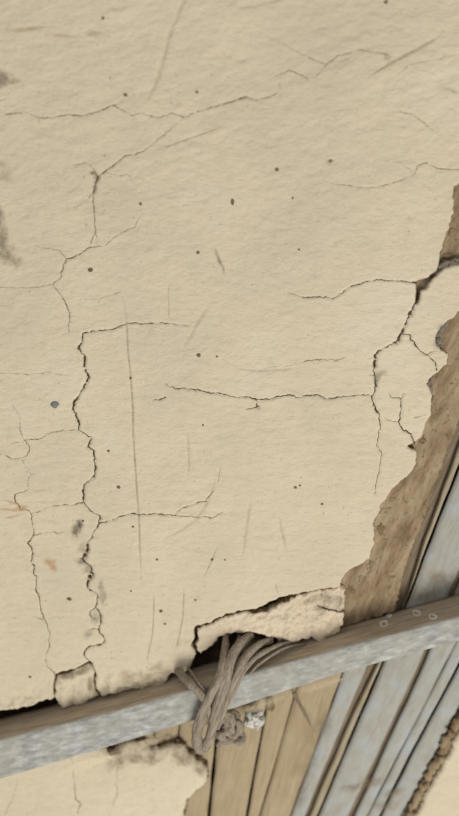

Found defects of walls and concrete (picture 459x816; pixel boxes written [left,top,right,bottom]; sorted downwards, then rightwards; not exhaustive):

spalling [415,184,459,301]
crack [0,41,387,674]
crack [152,279,437,495]
spalling [195,311,459,653]
spalling [404,712,459,816]